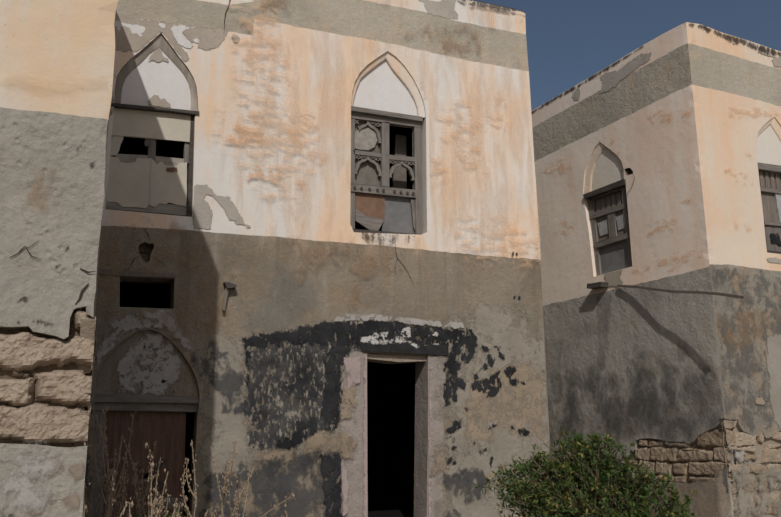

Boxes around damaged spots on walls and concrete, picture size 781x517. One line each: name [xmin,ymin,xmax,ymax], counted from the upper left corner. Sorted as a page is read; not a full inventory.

peeling [419,0,458,19]
peeling [115,17,240,62]
peeling [599,52,651,93]
peeling [192,184,251,230]
crack [9,240,40,259]
spalling [121,229,166,271]
crack [75,268,95,305]
leakage [715,268,781,431]
peeling [0,296,549,517]
spalling [627,419,781,517]